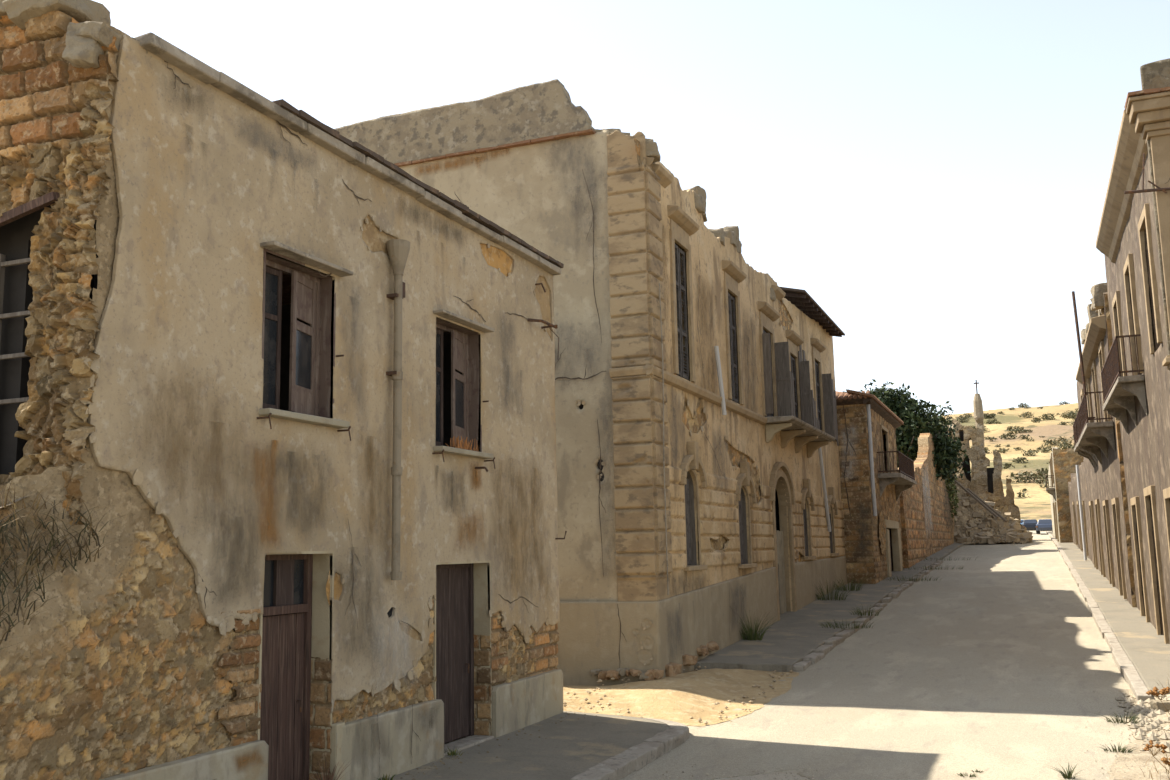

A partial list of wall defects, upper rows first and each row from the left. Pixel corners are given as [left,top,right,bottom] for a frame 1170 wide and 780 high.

spalling [360,216,395,256]
spalling [480,243,514,279]
crack [555,169,606,380]
peeling [206,614,258,636]
spalling [387,596,436,647]